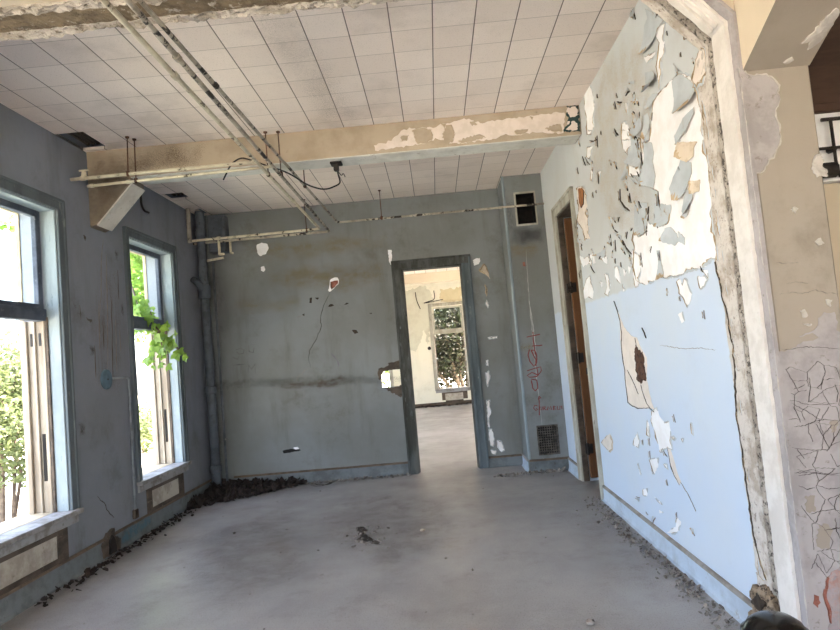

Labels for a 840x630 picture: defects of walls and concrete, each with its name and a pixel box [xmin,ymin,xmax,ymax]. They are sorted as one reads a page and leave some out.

spalling [0,0,404,41]
peeling [374,0,782,616]
crack [660,101,767,581]
crack [786,346,840,576]